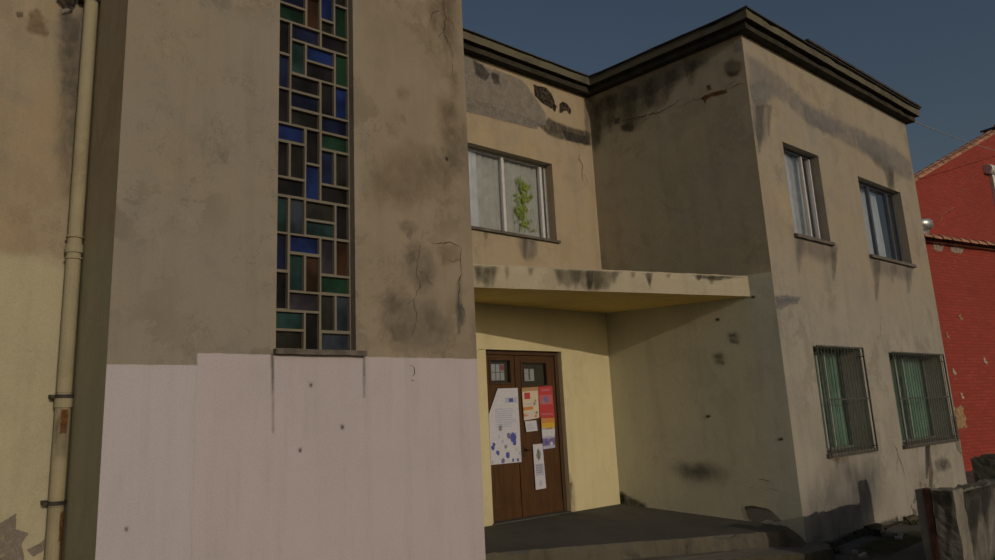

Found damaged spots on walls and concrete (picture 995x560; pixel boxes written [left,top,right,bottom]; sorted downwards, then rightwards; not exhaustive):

peeling [464,55,571,129]
crack [409,235,465,334]
peeling [953,393,967,455]
peeling [0,514,45,560]
peeling [745,506,781,526]